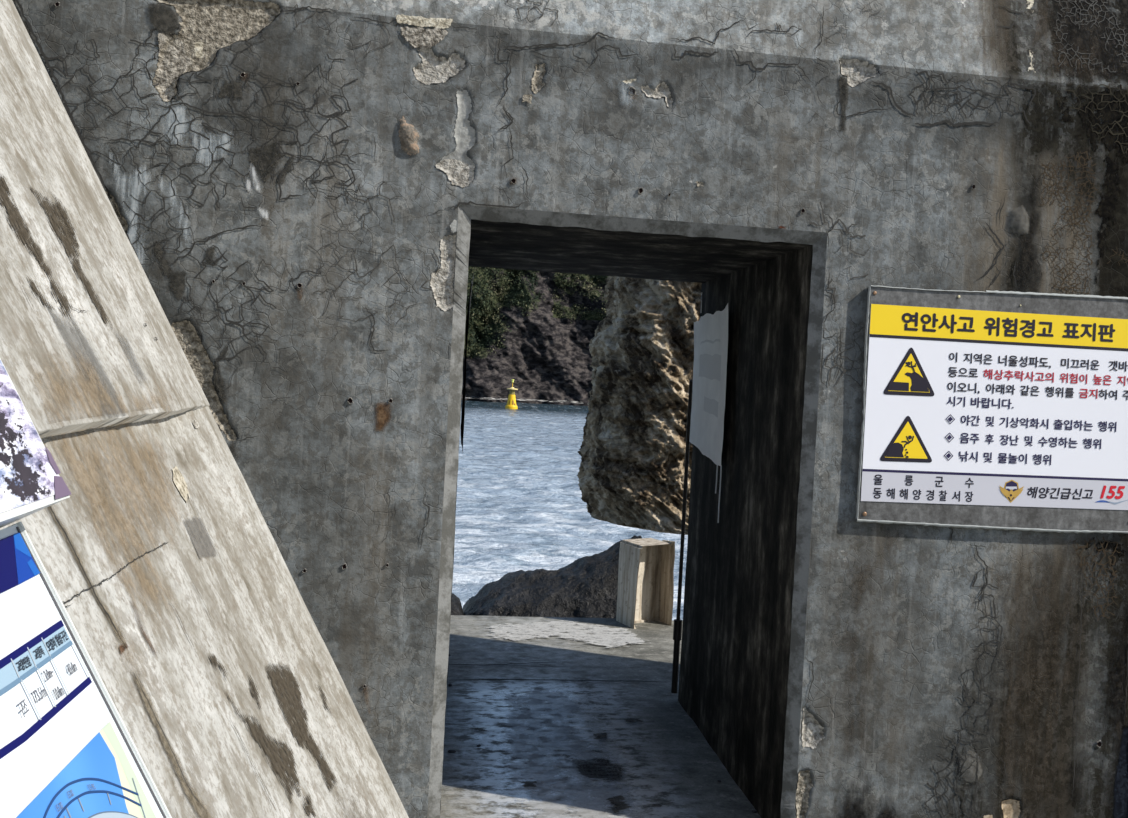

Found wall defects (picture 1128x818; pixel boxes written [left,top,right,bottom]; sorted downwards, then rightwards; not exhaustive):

water stain [0,175,143,417]
flaking render [153,0,280,102]
crack [39,0,641,400]
flaking render [396,14,466,85]
flaking render [430,220,457,311]
flaking render [435,90,476,187]
crack [810,202,870,388]
crack [671,0,1036,127]
water stain [1015,192,1041,293]
crack [976,0,1128,295]
water stain [1046,0,1128,283]
water stain [226,663,338,818]